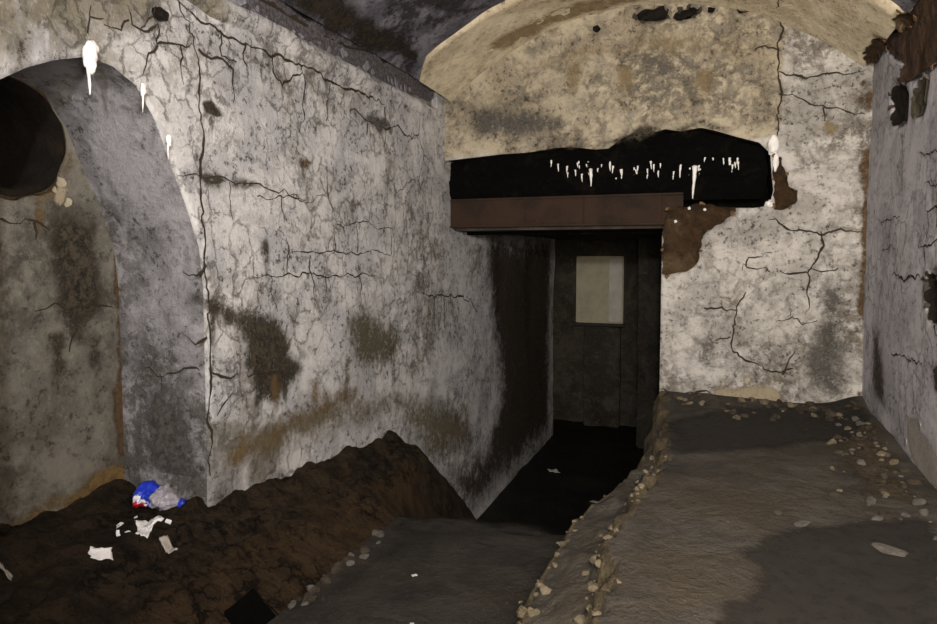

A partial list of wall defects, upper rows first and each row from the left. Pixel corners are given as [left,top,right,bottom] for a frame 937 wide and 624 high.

crack [755,0,866,136]
spalling [862,0,937,127]
crack [0,218,50,240]
leakage [193,294,302,410]
crack [87,0,435,476]
leakage [345,308,400,387]
crack [422,292,476,331]
spalling [661,202,736,279]
crack [704,292,796,375]
crack [742,216,900,325]
crack [892,181,937,283]
spalling [923,271,937,323]